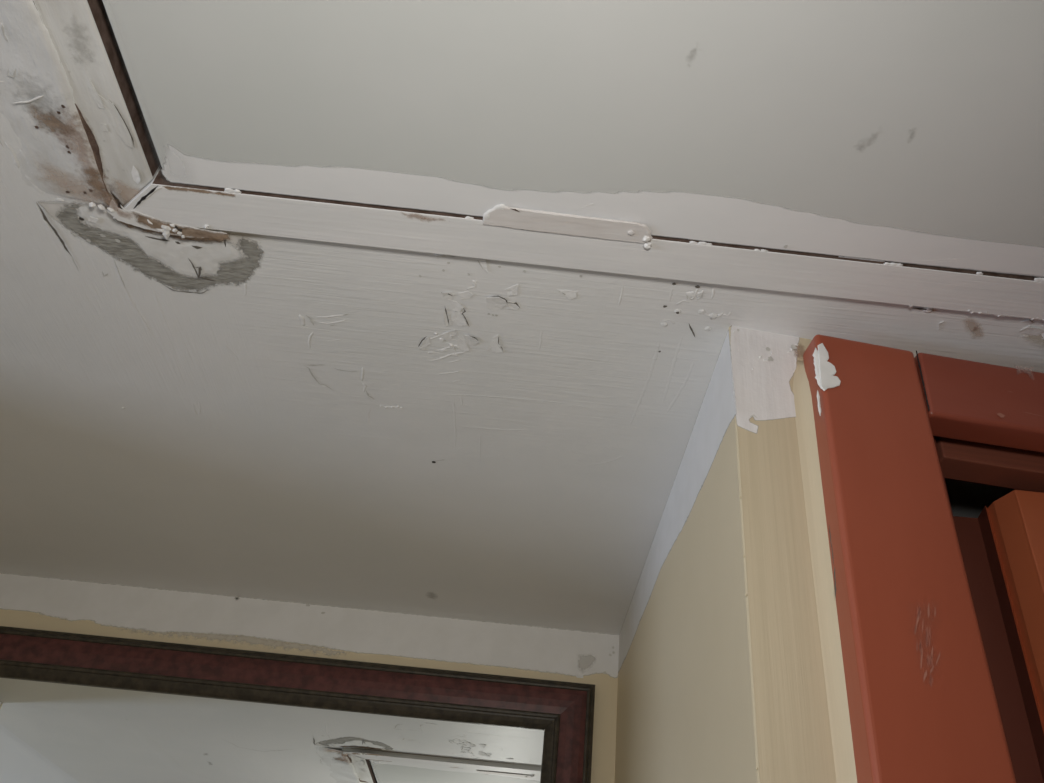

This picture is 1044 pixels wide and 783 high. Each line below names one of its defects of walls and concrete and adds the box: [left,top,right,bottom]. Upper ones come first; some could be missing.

flaking render [0,0,263,293]